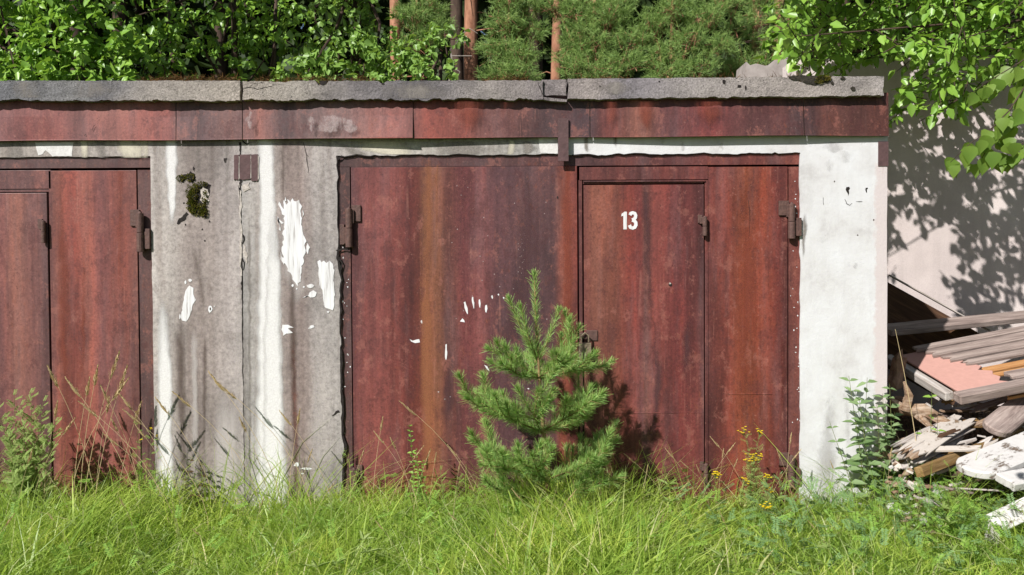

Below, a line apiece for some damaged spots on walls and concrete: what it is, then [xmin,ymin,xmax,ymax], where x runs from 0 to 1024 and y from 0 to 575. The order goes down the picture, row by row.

damp [158,309,205,503]
peeling [179,279,196,321]
crack [239,141,250,508]
damp [214,139,295,512]
peeling [277,197,335,313]